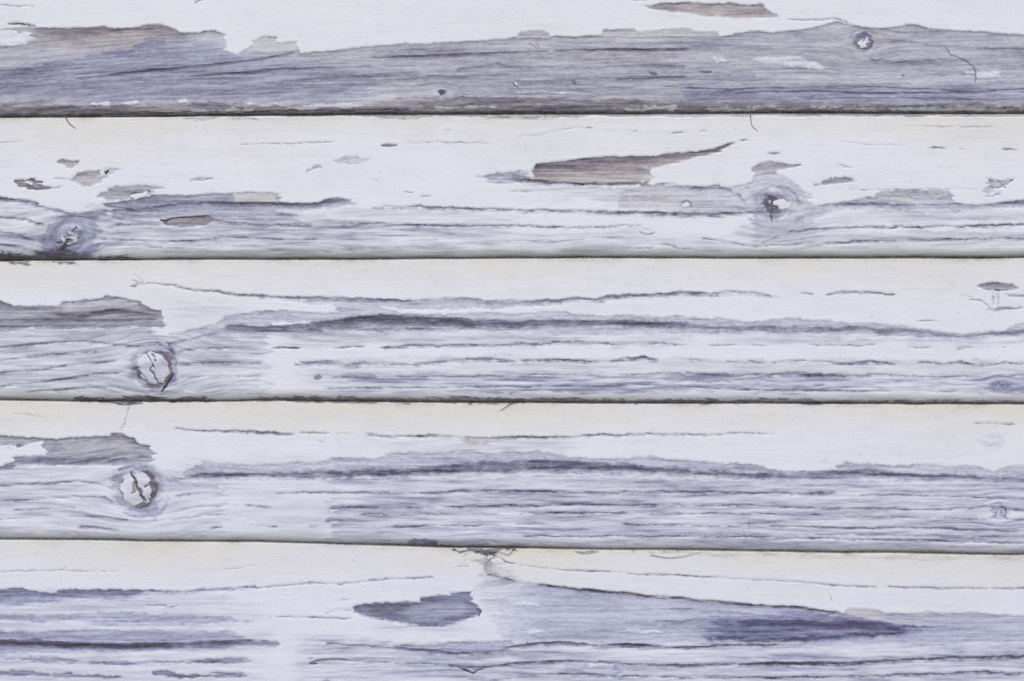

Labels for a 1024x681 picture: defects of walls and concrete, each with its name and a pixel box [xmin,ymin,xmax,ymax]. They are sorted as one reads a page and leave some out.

peeling [0,0,1024,135]
peeling [0,158,358,257]
peeling [474,138,1024,245]
peeling [0,281,1024,342]
peeling [136,351,170,384]
peeling [293,355,1024,381]
peeling [0,432,1024,505]
peeling [0,573,1024,650]